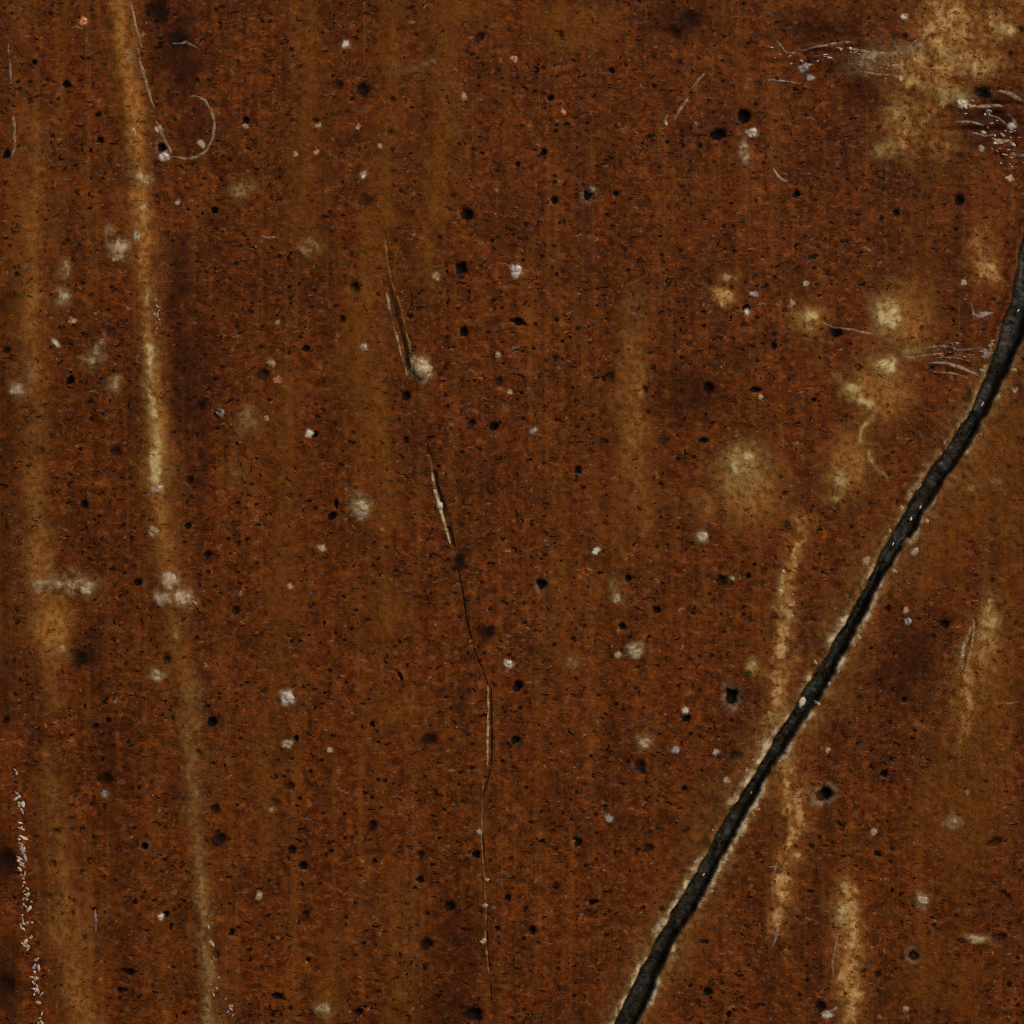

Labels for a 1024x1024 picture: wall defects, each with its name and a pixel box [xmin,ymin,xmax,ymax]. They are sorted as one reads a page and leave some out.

damp [770,0,1024,167]
damp [109,0,171,554]
crack [384,240,411,374]
damp [714,288,733,307]
damp [798,311,819,331]
damp [846,288,993,417]
damp [727,449,773,516]
damp [827,423,872,500]
damp [154,572,197,606]
crack [609,236,1024,1024]
crack [427,444,493,997]
damp [195,847,234,1024]